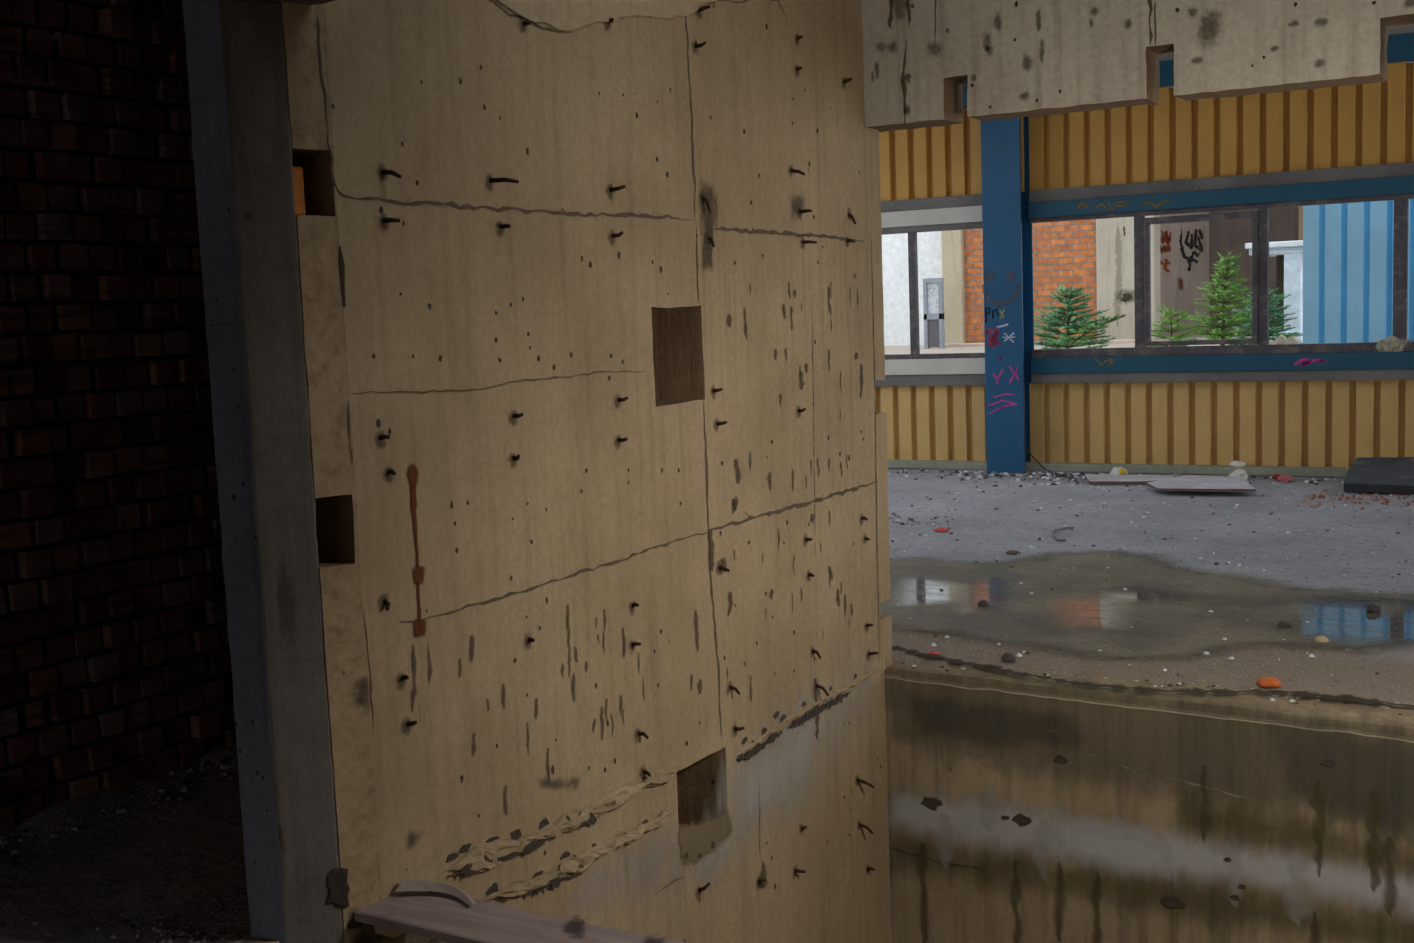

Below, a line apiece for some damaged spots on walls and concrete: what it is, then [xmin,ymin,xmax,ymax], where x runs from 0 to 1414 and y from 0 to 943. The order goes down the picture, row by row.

crack [318,0,879,735]
corrosion [385,464,432,733]
spalling [445,829,522,863]
spalling [464,661,1414,943]
leakage [893,765,1414,943]